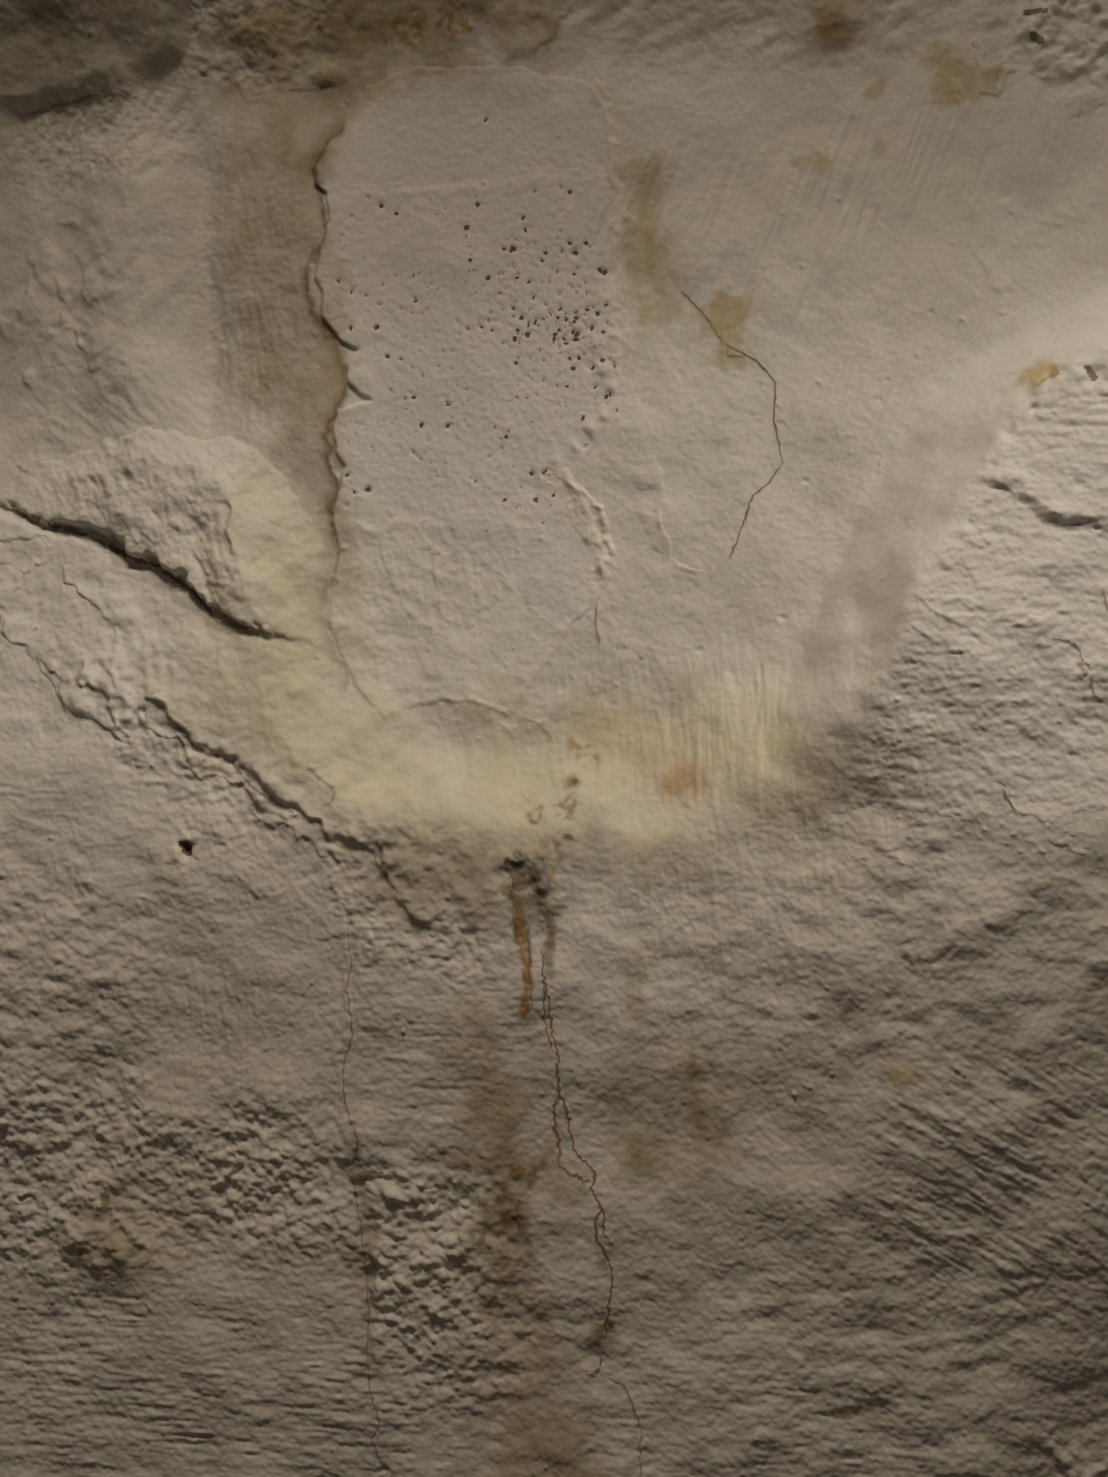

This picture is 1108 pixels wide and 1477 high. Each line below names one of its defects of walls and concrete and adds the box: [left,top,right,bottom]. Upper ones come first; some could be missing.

damp [0,0,136,76]
crack [682,292,783,557]
damp [258,553,318,771]
damp [476,712,642,840]
damp [720,711,799,799]
rust [506,889,532,1014]
crack [541,948,643,1477]